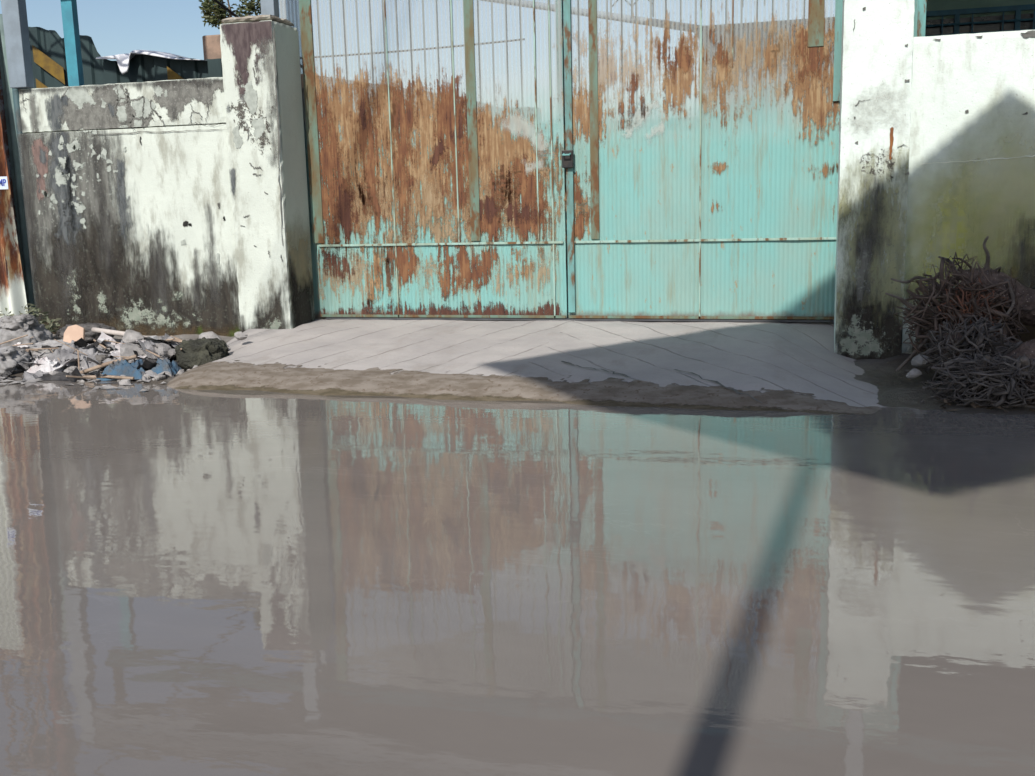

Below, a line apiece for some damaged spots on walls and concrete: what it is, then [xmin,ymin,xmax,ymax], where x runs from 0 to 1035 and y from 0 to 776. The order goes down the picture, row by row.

peeling [32,80,273,229]
leakage [15,21,315,337]
corrosion [314,4,840,316]
leakage [835,149,939,360]